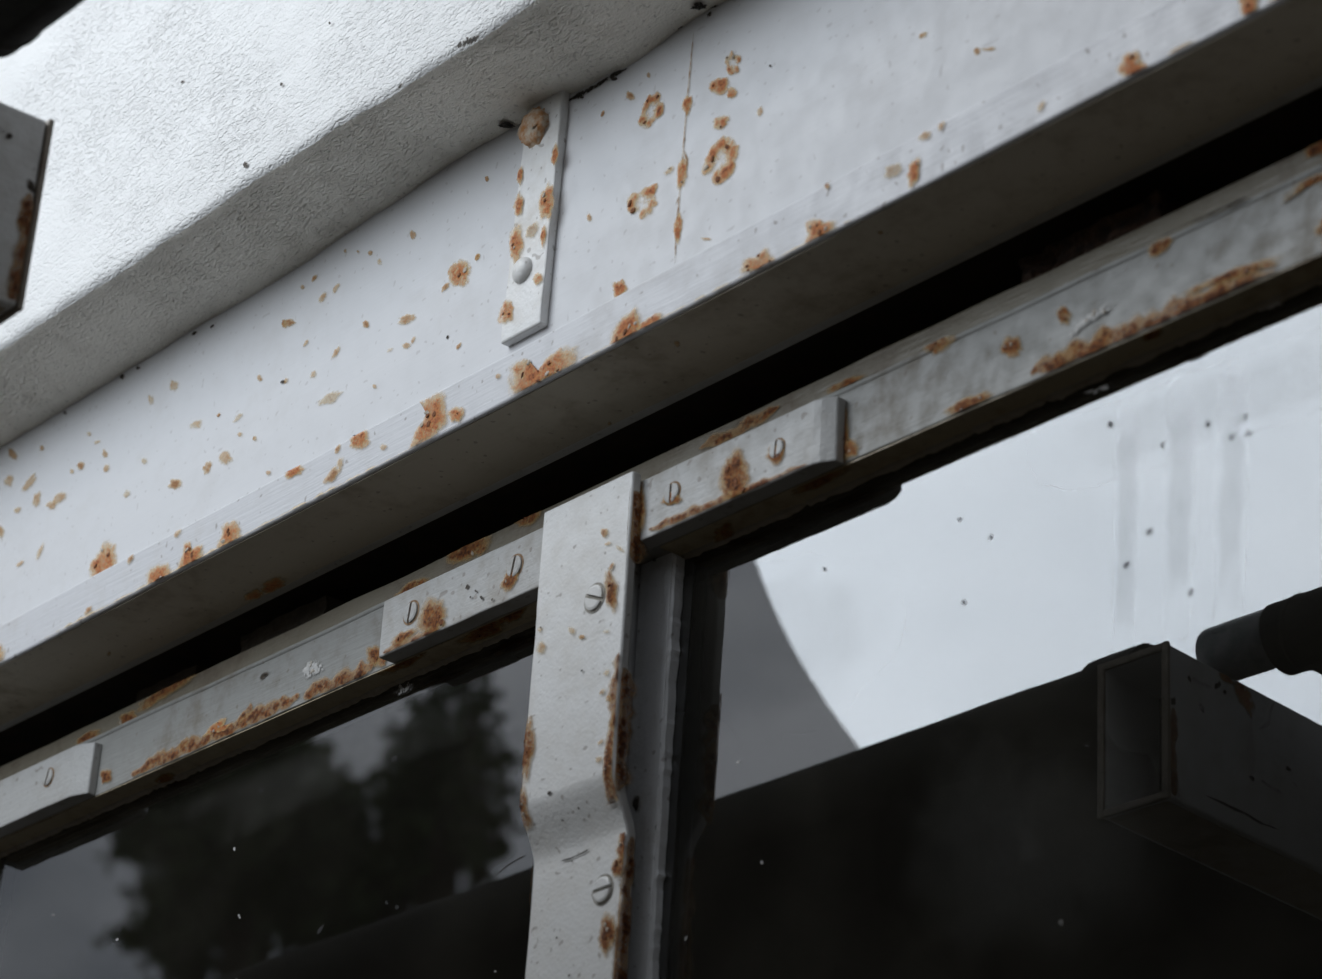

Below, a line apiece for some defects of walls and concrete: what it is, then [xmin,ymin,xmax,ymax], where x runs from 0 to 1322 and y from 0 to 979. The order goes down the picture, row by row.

rust [509,167,554,261]
rust [626,92,663,127]
rust [627,116,738,219]
rust [709,51,741,98]
rust [496,213,864,396]
rust [1030,259,1274,375]
rust [40,395,464,641]
rust [605,564,618,608]
rust [627,406,806,563]
rust [131,599,445,777]
rust [598,653,636,806]
rust [599,832,635,979]